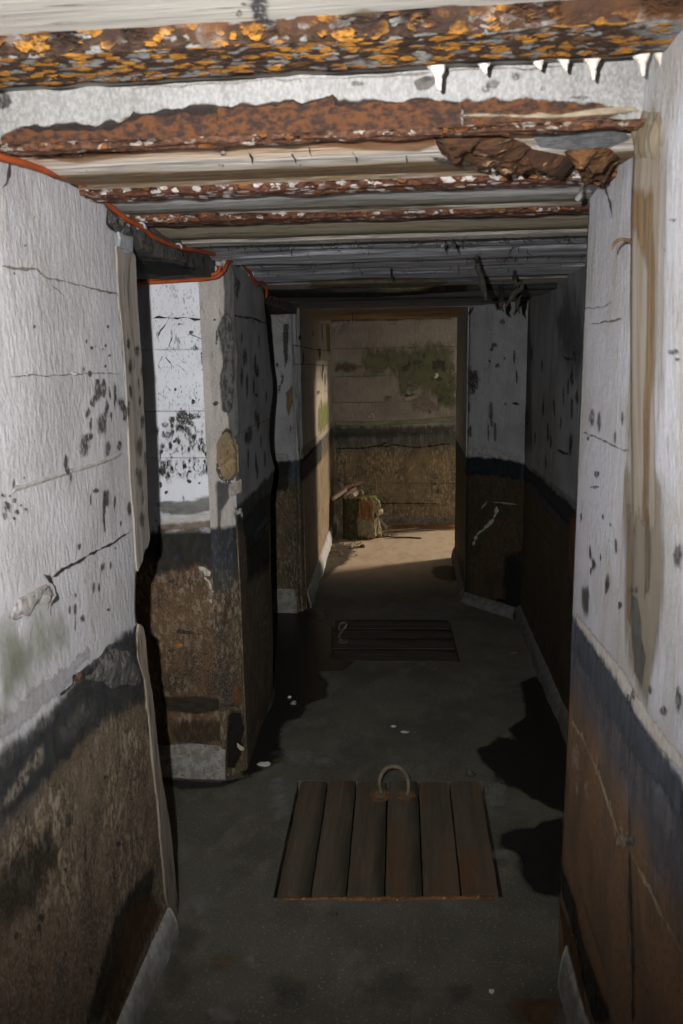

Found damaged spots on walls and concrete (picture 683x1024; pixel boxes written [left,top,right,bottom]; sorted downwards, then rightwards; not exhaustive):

spalling [431,129,629,190]
crack [4,255,201,377]
leakage [155,264,456,603]
rust [1,94,665,701]
crack [584,432,628,452]
spalling [8,574,60,620]
crack [52,528,133,577]
leakage [673,545,682,567]
leakage [0,632,145,815]
leakage [0,833,55,917]
leakage [88,869,160,1024]